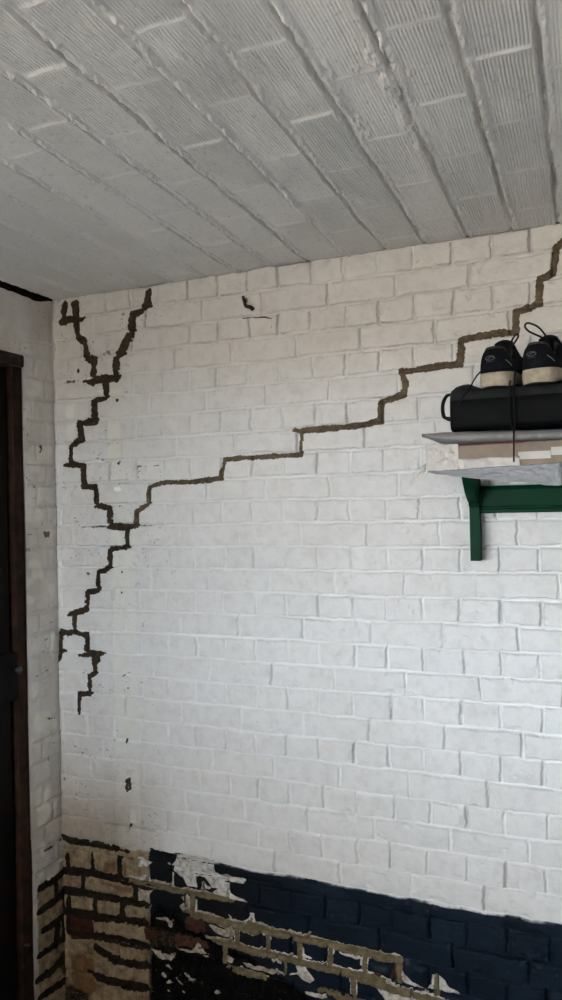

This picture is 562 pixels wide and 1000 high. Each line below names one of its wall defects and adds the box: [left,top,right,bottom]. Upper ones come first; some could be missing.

crack [0,238,562,715]
peeling [127,854,460,1000]